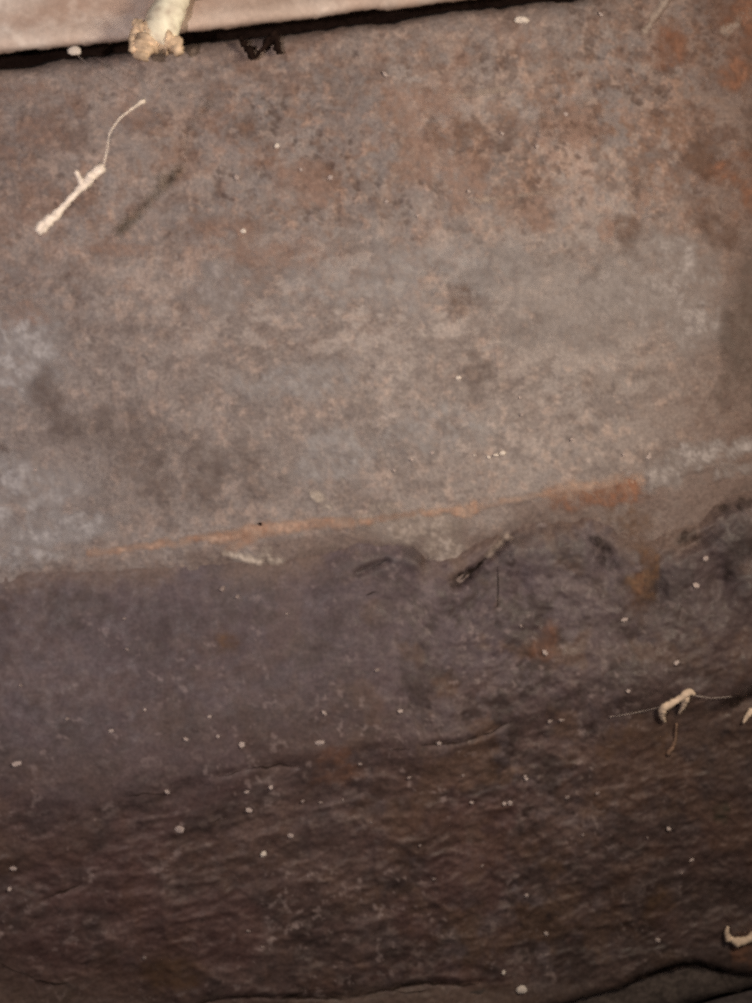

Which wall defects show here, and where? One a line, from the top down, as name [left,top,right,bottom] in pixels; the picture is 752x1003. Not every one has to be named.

rust [109,519,371,553]